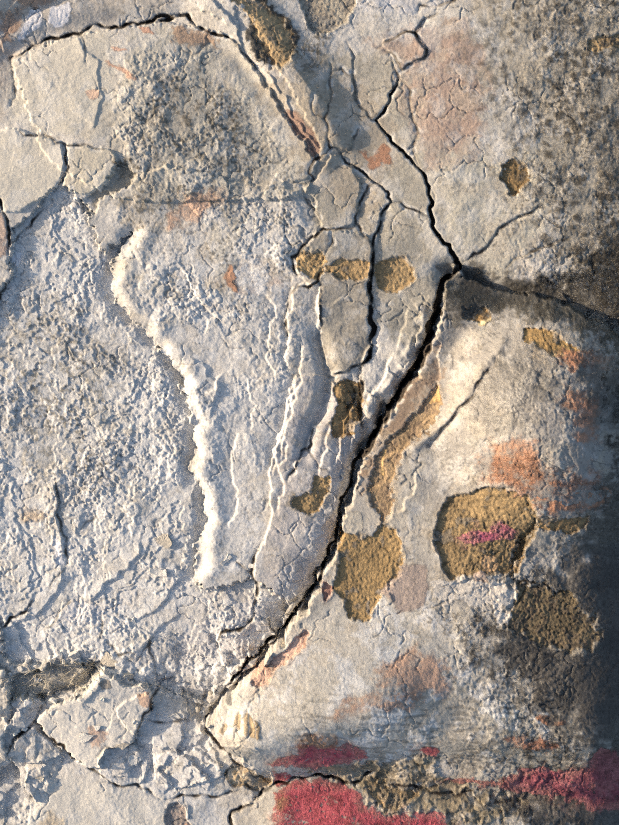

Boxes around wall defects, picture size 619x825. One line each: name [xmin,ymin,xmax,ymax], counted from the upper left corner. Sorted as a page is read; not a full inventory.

crack [0,199,39,245]
crack [25,13,231,52]
spalling [0,186,310,707]
spalling [231,0,297,73]
crack [138,0,484,825]
spalling [299,0,356,36]
spalling [295,249,417,294]
spalling [322,379,611,654]
leakage [436,172,619,448]
leakage [479,0,619,227]
leakage [460,458,619,825]
crack [13,723,151,792]